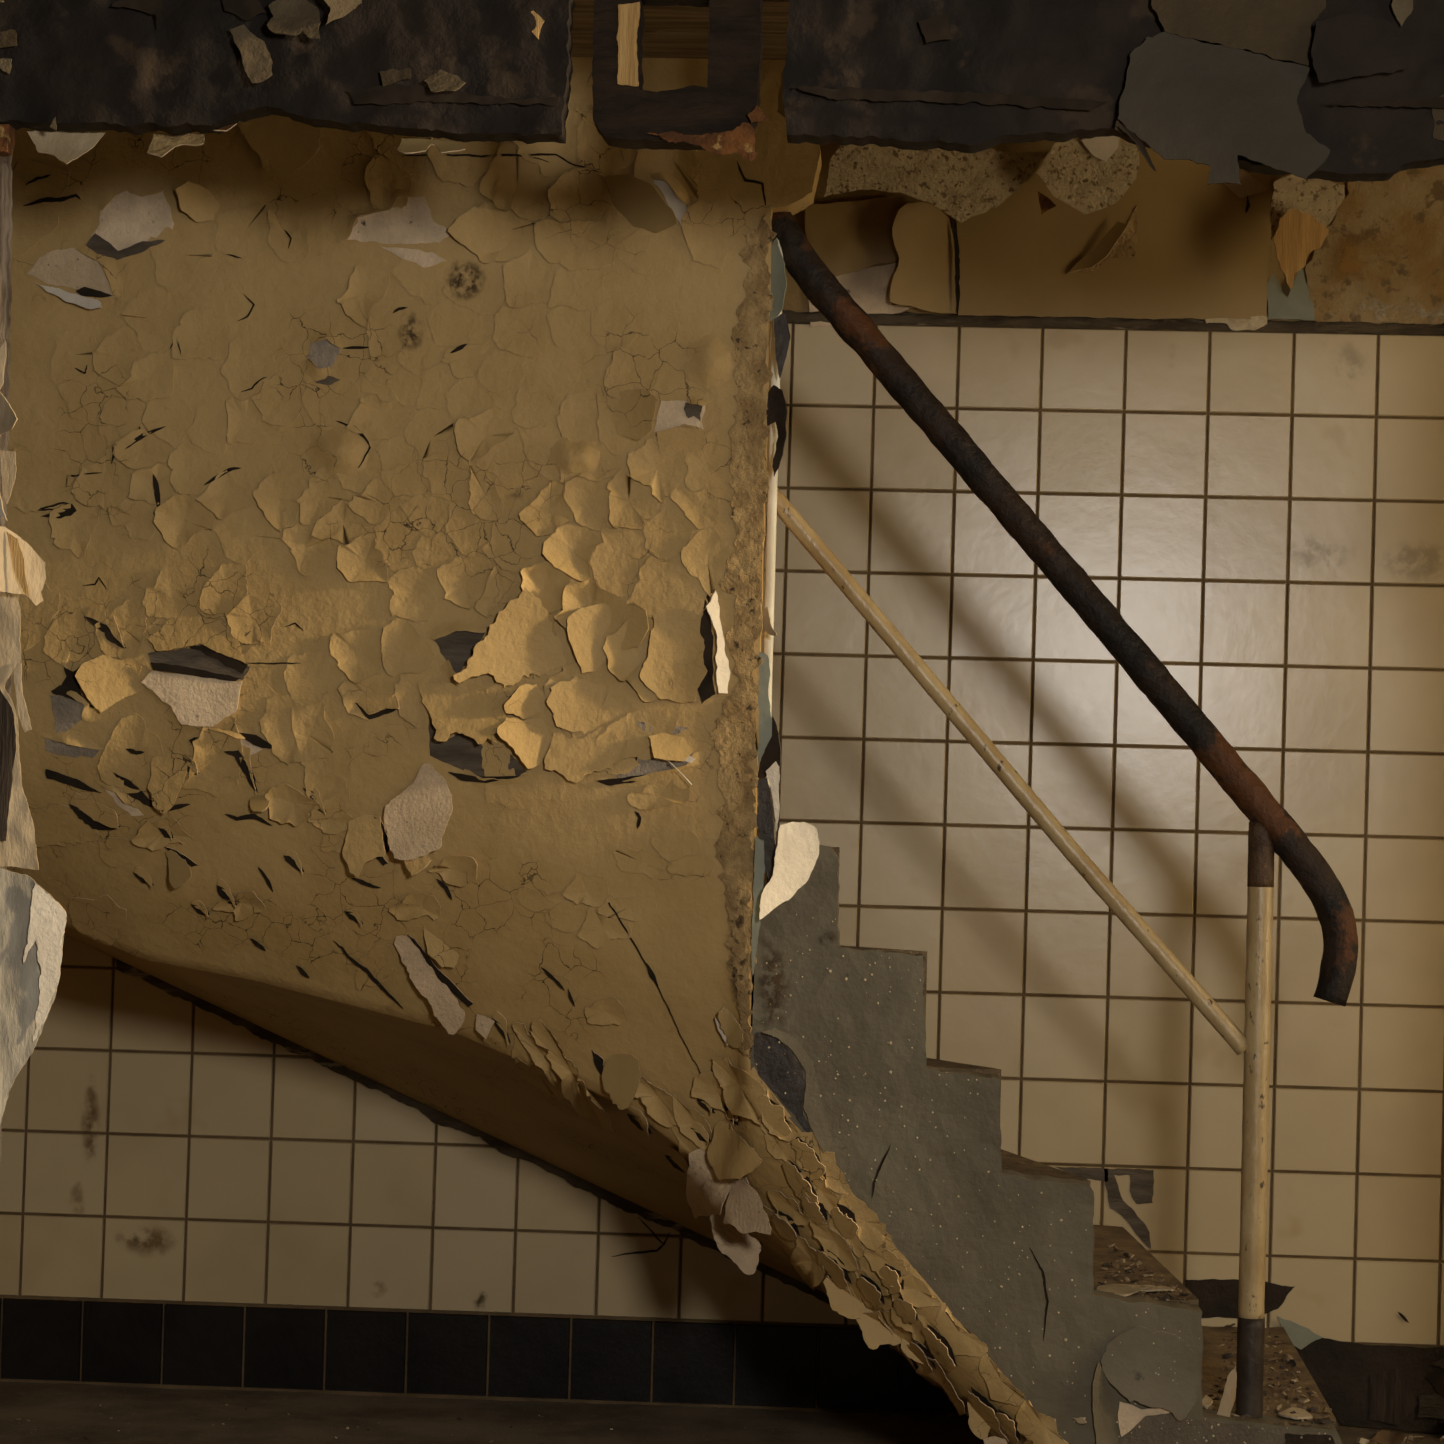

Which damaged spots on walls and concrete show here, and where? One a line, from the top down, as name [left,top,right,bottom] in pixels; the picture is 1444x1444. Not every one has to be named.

peeling [1081,136,1120,162]
peeling [0,107,1069,1444]
spalling [1057,1167,1154,1249]
spalling [1185,1279,1239,1318]
peeling [1264,1282,1323,1349]
spalling [1092,1361,1338,1444]